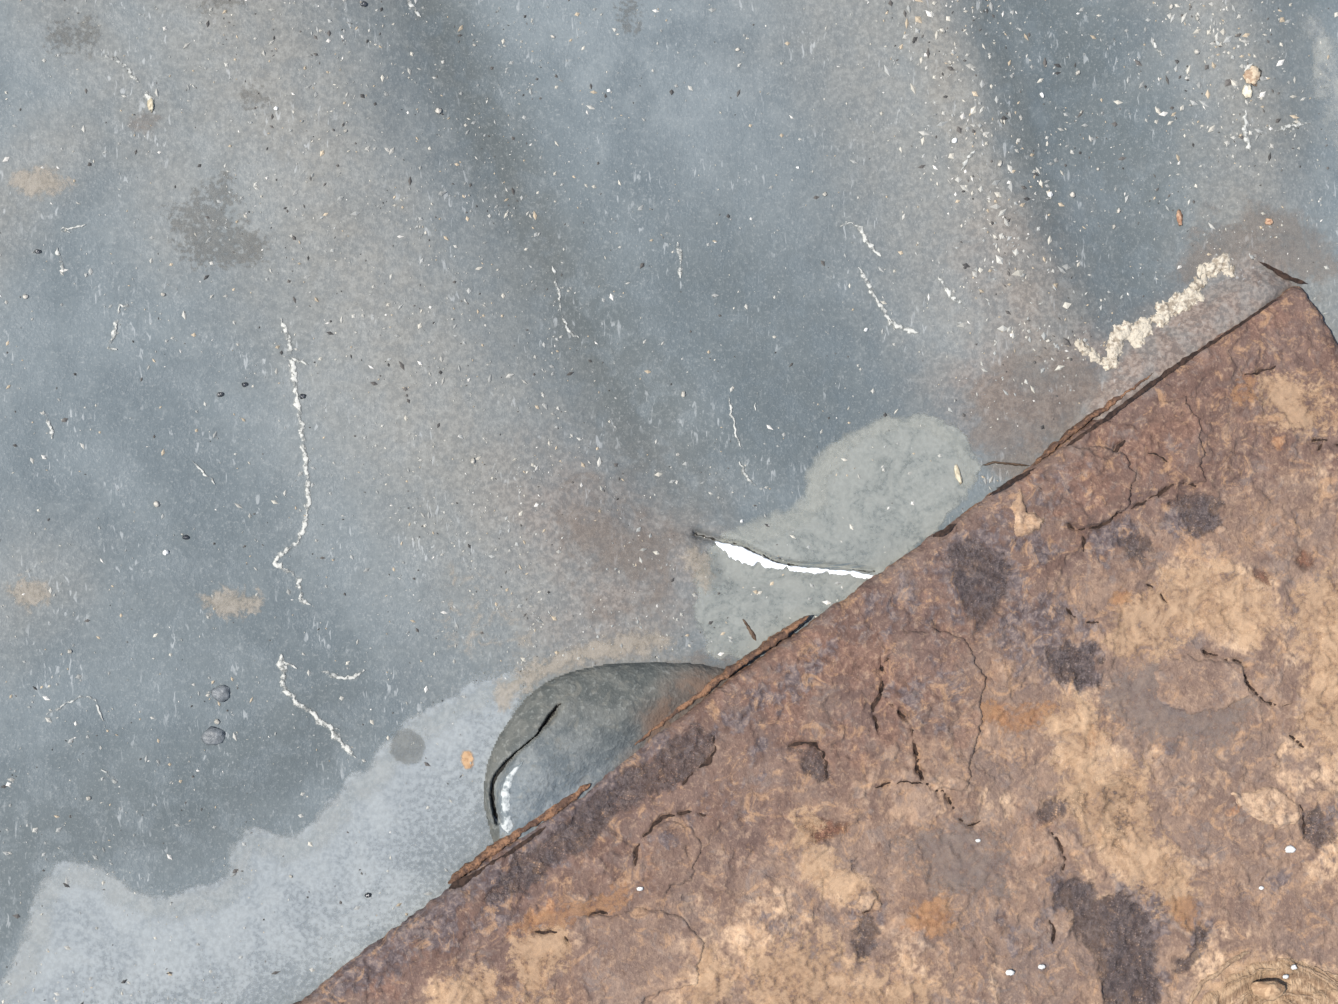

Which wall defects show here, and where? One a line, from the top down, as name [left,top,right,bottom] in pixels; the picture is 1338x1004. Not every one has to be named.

leakage [1074,253,1235,371]
crack [273,318,311,605]
leakage [693,414,980,659]
rust [1010,445,1137,537]
leakage [0,673,526,1004]
crack [277,654,365,758]
rust [461,751,473,769]
rust [881,627,986,792]
rust [1153,654,1253,715]
rust [1231,786,1302,828]
rust [570,820,705,1004]
rust [848,883,881,913]